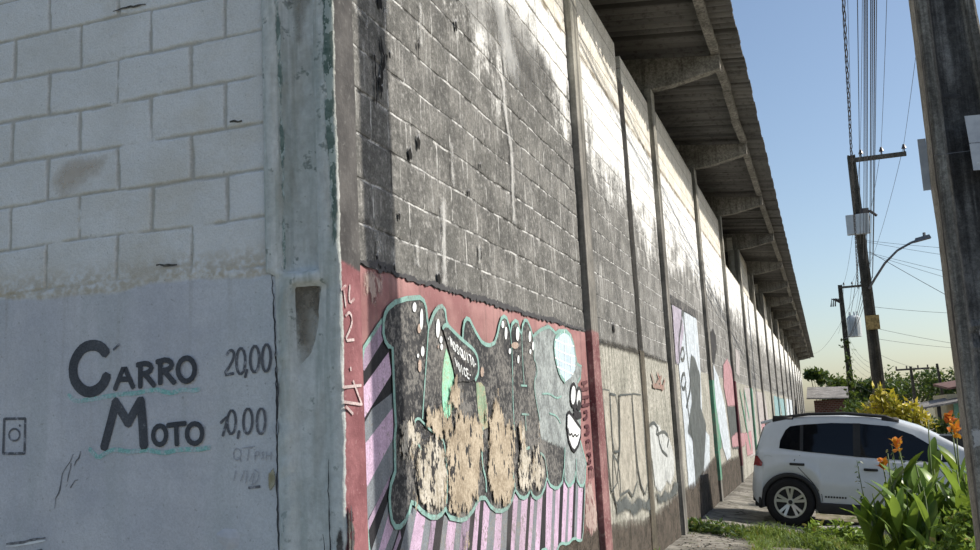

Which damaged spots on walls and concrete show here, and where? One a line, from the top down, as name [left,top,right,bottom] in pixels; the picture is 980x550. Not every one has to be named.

peeling [274,0,282,99]
peeling [322,0,337,242]
water stain [375,36,385,104]
water stain [466,0,547,220]
water stain [599,78,742,550]
peeling [400,374,545,518]
water stain [558,527,600,550]